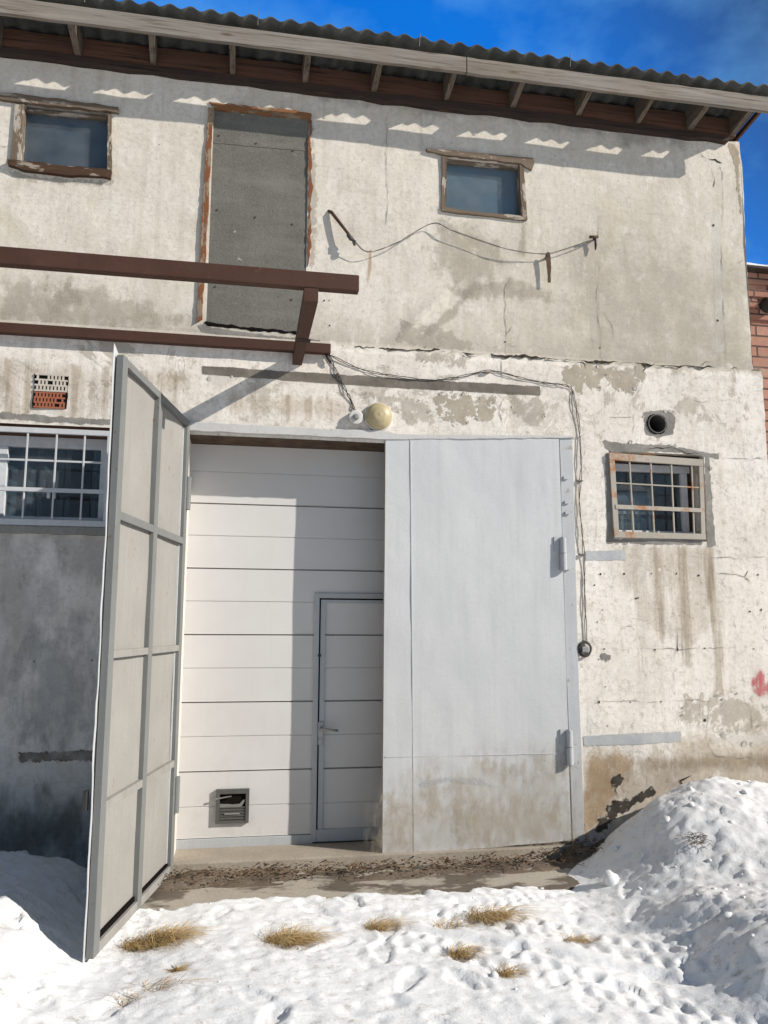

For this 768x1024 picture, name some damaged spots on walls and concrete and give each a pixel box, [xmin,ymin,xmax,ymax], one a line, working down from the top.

crack [354,219,747,424]
peeling [561,363,646,395]
peeling [418,391,497,427]
damp [0,806,81,853]
damp [584,755,630,836]
spalling [595,773,656,832]